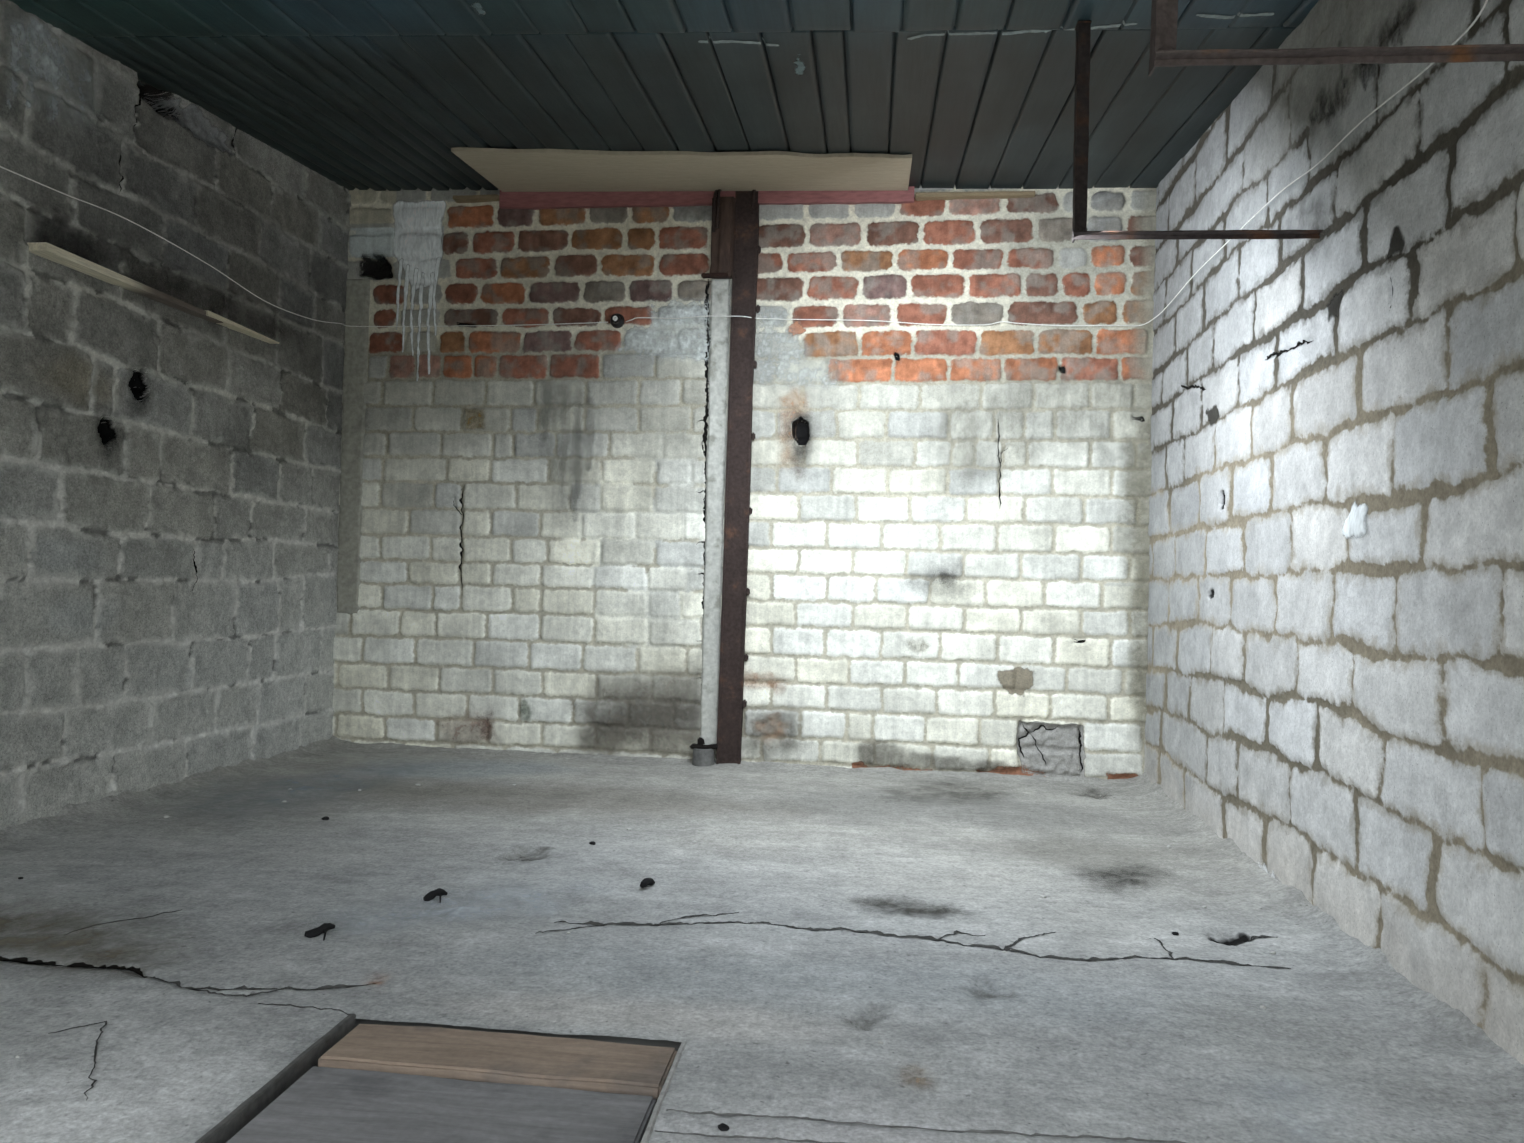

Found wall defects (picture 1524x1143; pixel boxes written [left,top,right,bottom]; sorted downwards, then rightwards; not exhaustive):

leakage [393,201,446,381]
leakage [584,677,700,754]
crack [0,909,376,1015]
crack [535,912,1291,969]
crack [48,1020,107,1100]